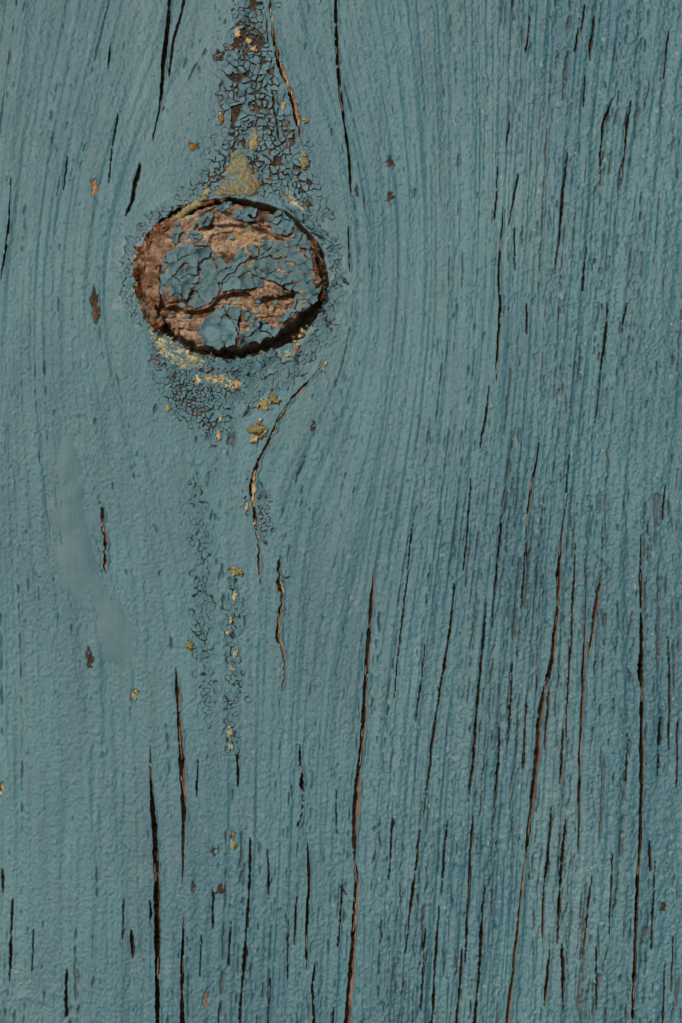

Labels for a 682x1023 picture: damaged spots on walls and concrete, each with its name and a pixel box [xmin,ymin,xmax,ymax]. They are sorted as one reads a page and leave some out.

crack [512,1,530,52]
crack [574,6,595,102]
crack [662,32,670,79]
crack [599,98,631,185]
crack [554,156,568,273]
peeling [159,200,322,350]
crack [480,172,528,448]
crack [595,304,627,422]
crack [97,498,111,573]
crack [108,0,354,1023]
crack [267,439,682,1023]
crack [1,869,34,981]